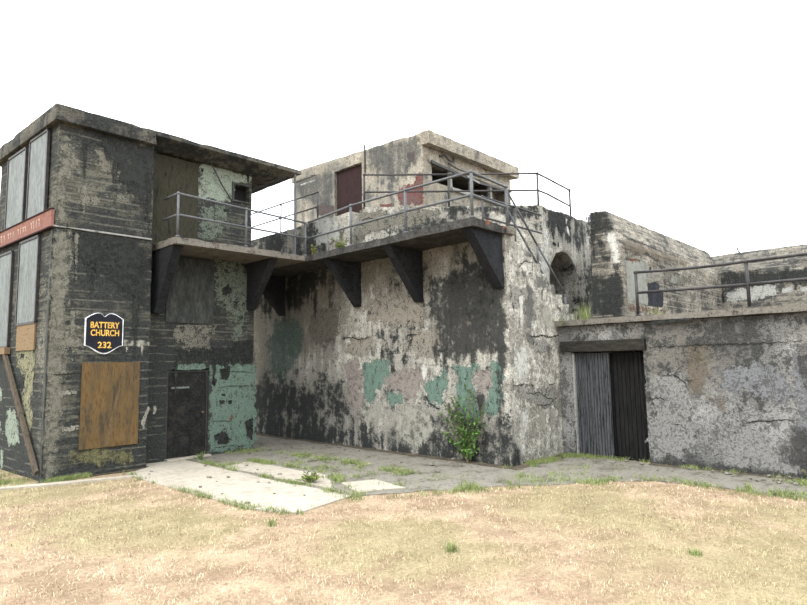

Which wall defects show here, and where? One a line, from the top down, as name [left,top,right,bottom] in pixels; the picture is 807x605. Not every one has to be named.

peeling [197,164,252,242]
leakage [584,210,690,317]
spalling [172,324,217,352]
peeling [212,259,248,342]
leakage [267,319,303,385]
leakage [428,203,571,438]
peeling [174,363,258,454]
leakage [359,403,384,433]
leakage [394,405,437,453]
spalling [513,383,557,410]
leakage [516,406,554,454]
crack [515,383,557,406]